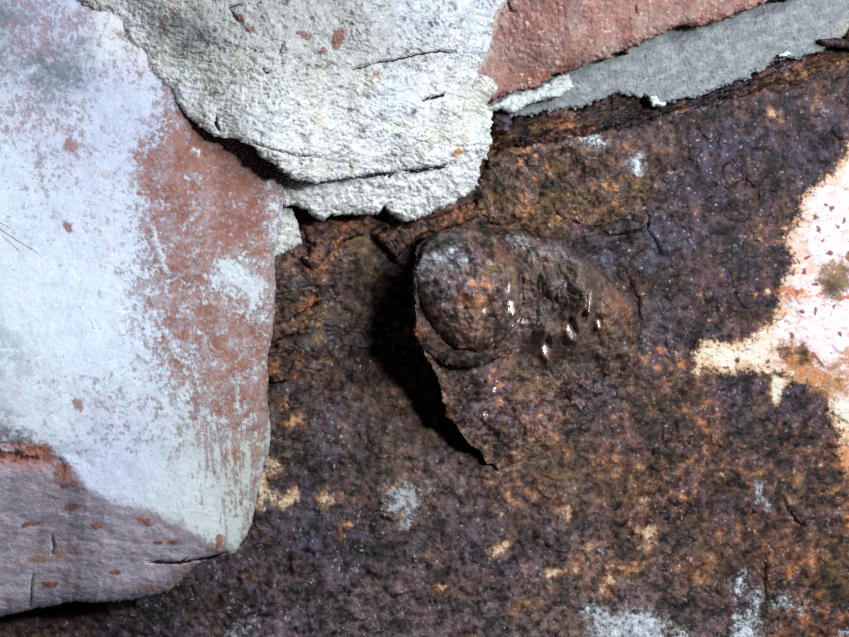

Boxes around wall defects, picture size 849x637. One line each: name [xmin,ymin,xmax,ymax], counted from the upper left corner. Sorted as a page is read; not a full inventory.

spalling [317,28,345,67]
crack [353,50,452,70]
corrosion [299,217,369,274]
crack [370,226,397,264]
corrosion [377,202,476,258]
peeling [0,0,285,555]
corrosion [775,251,849,300]
peeling [690,140,849,478]
corrosion [267,296,322,384]
corrosion [776,341,849,396]